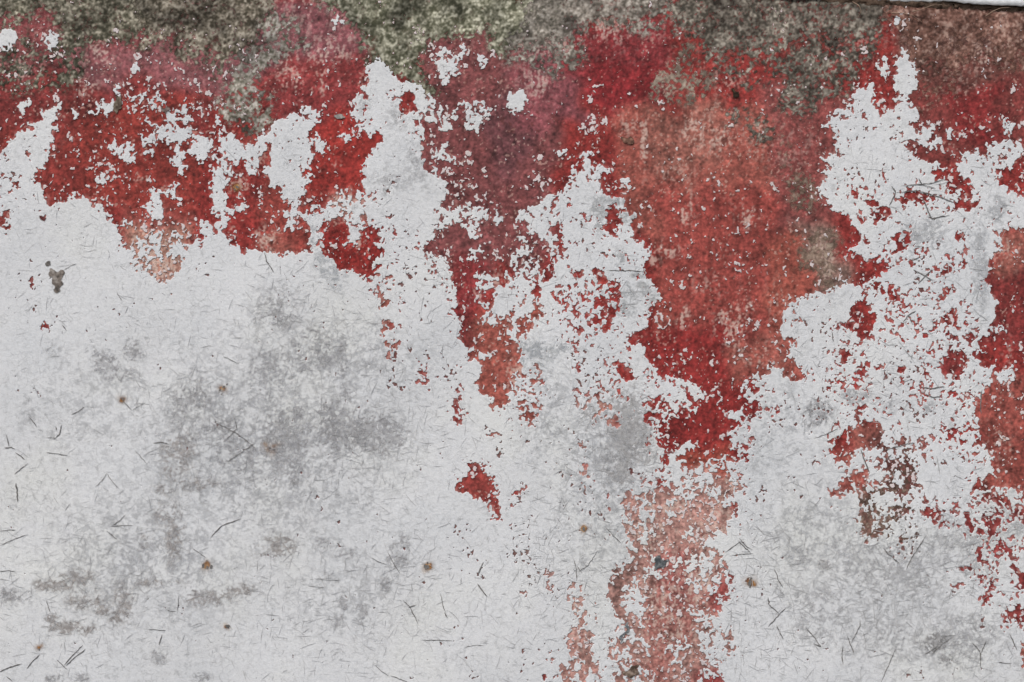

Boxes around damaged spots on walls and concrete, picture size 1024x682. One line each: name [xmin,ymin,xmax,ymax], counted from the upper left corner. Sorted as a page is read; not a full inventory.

peeling [0,172,35,235]
peeling [18,259,65,293]
peeling [408,348,469,426]
peeling [455,460,503,521]
peeling [556,424,611,521]